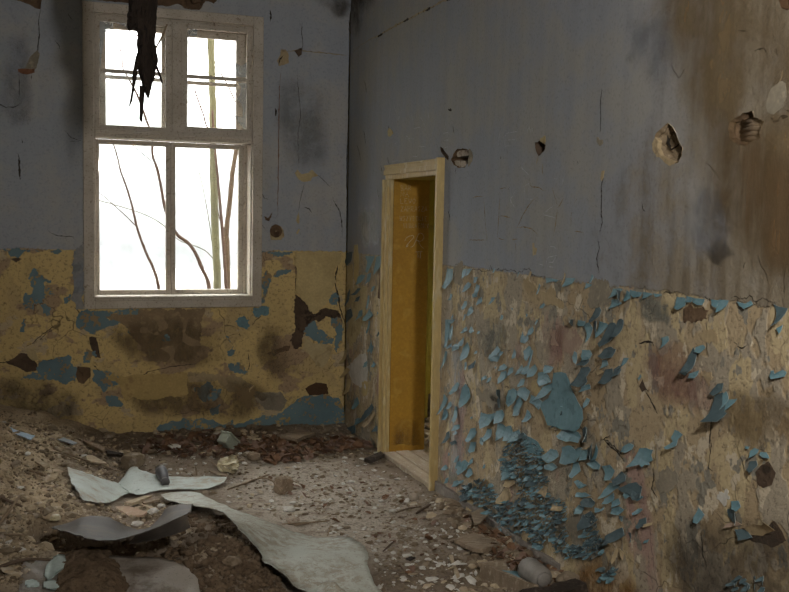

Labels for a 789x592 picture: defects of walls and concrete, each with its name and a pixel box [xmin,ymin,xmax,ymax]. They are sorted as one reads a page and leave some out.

flaking render [158,0,217,10]
spalling [652,123,683,166]
spalling [728,111,764,146]
crack [595,180,603,269]
peeling [64,242,139,335]
peeling [156,250,381,434]
peeling [439,268,495,371]
peeling [674,296,753,323]
peeling [21,347,123,407]
damp [133,383,211,412]
peeling [437,288,661,584]
peeling [717,489,775,541]